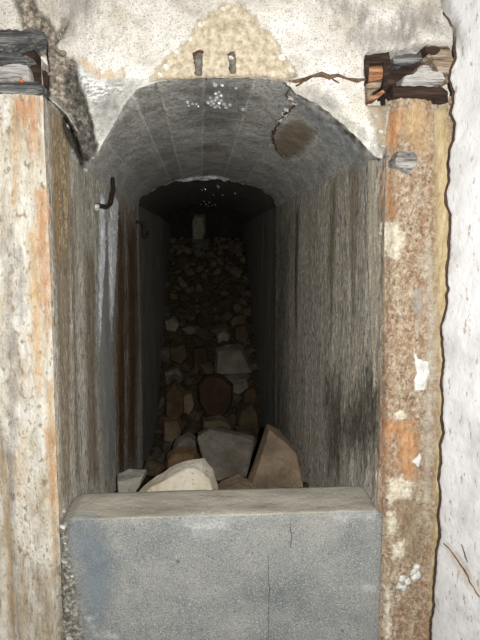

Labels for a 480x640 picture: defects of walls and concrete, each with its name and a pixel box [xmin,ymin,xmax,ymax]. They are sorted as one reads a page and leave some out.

spalling [15,0,98,173]
crack [287,72,366,96]
corrosion [430,109,450,615]
efflorescence [383,474,416,559]
efflorescence [382,564,421,639]
crack [443,543,480,597]